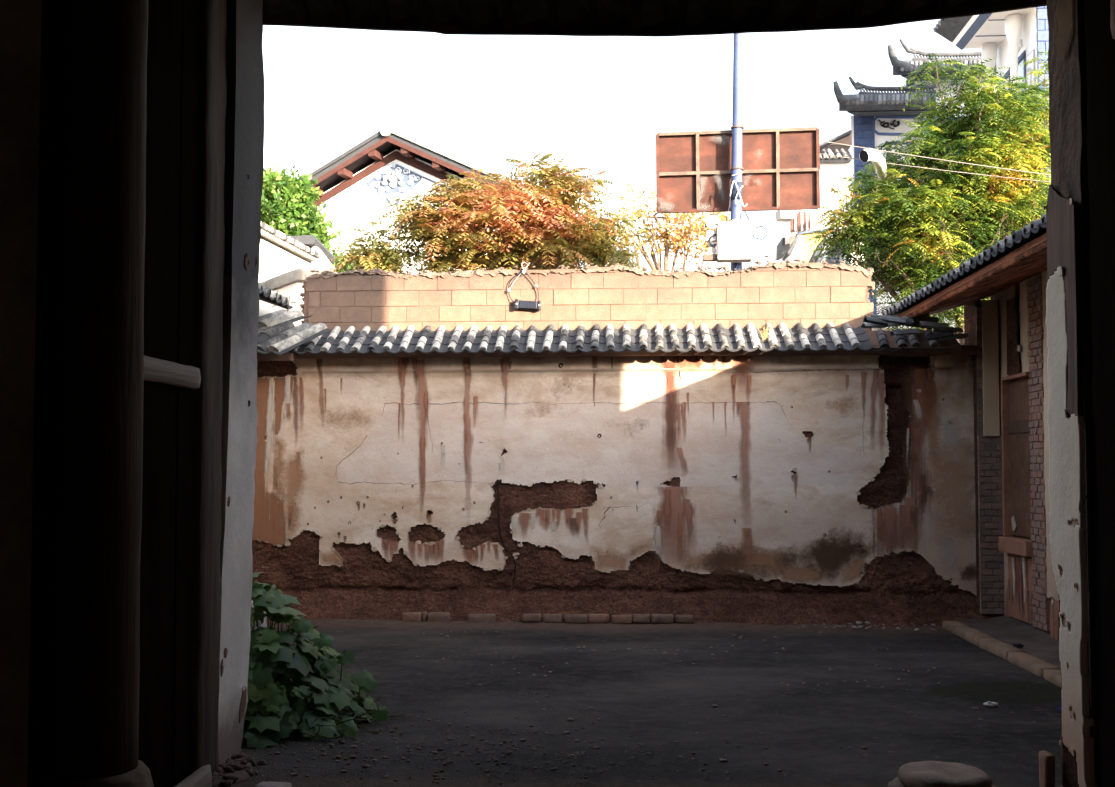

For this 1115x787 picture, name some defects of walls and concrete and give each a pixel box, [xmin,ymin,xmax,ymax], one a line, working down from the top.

spalling [252,479,992,627]
spalling [661,477,681,487]
spalling [856,355,930,509]